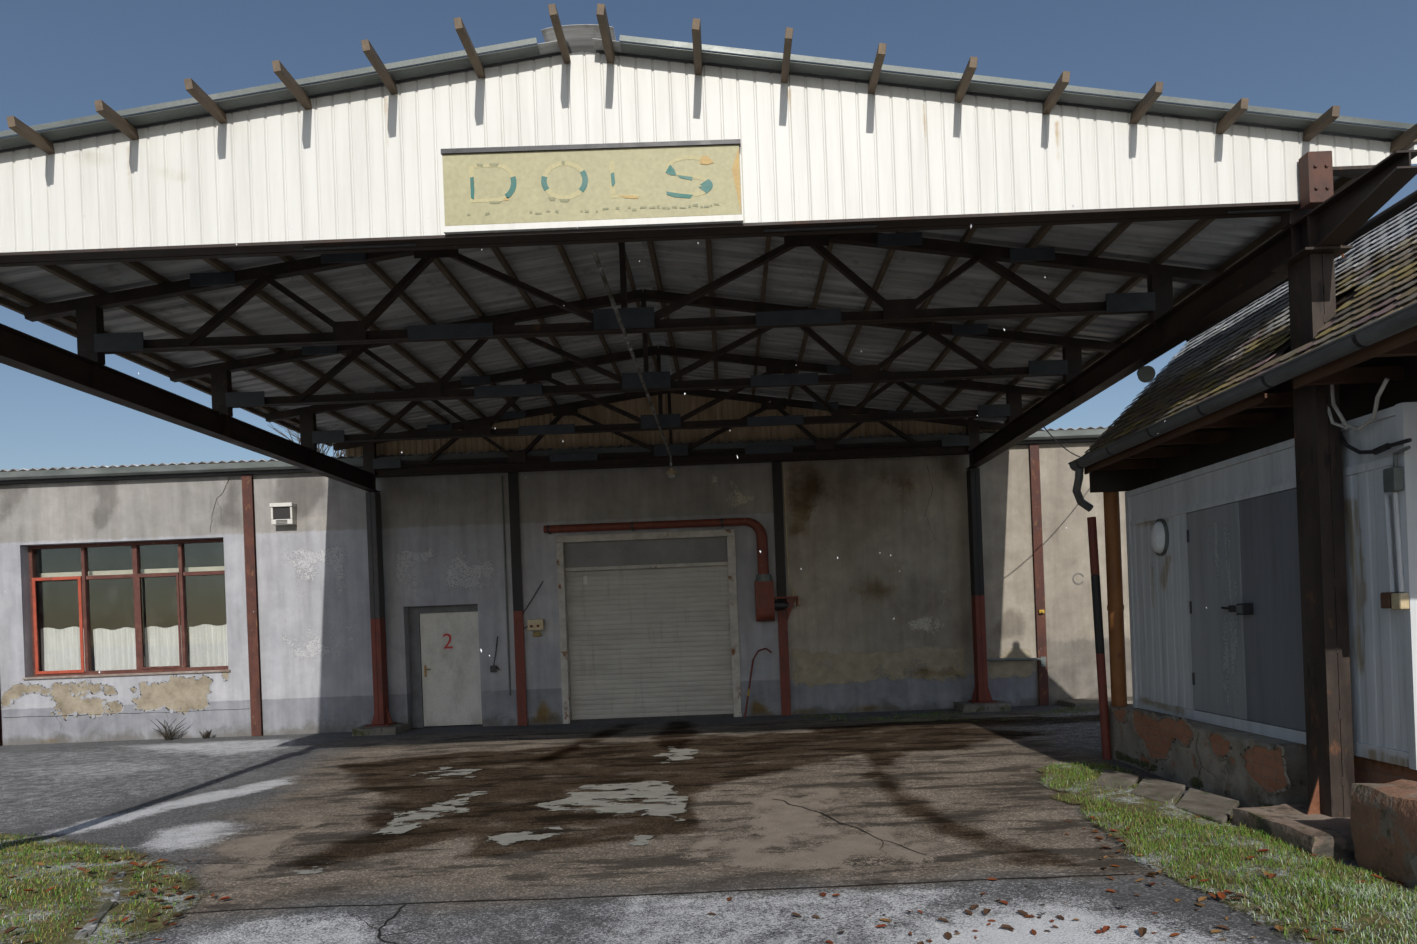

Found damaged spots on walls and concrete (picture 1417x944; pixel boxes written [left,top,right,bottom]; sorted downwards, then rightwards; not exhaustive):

flaking render [1,672,231,721]
flaking render [1131,708,1195,770]
flaking render [1240,739,1291,796]
crack [175,799,1128,944]